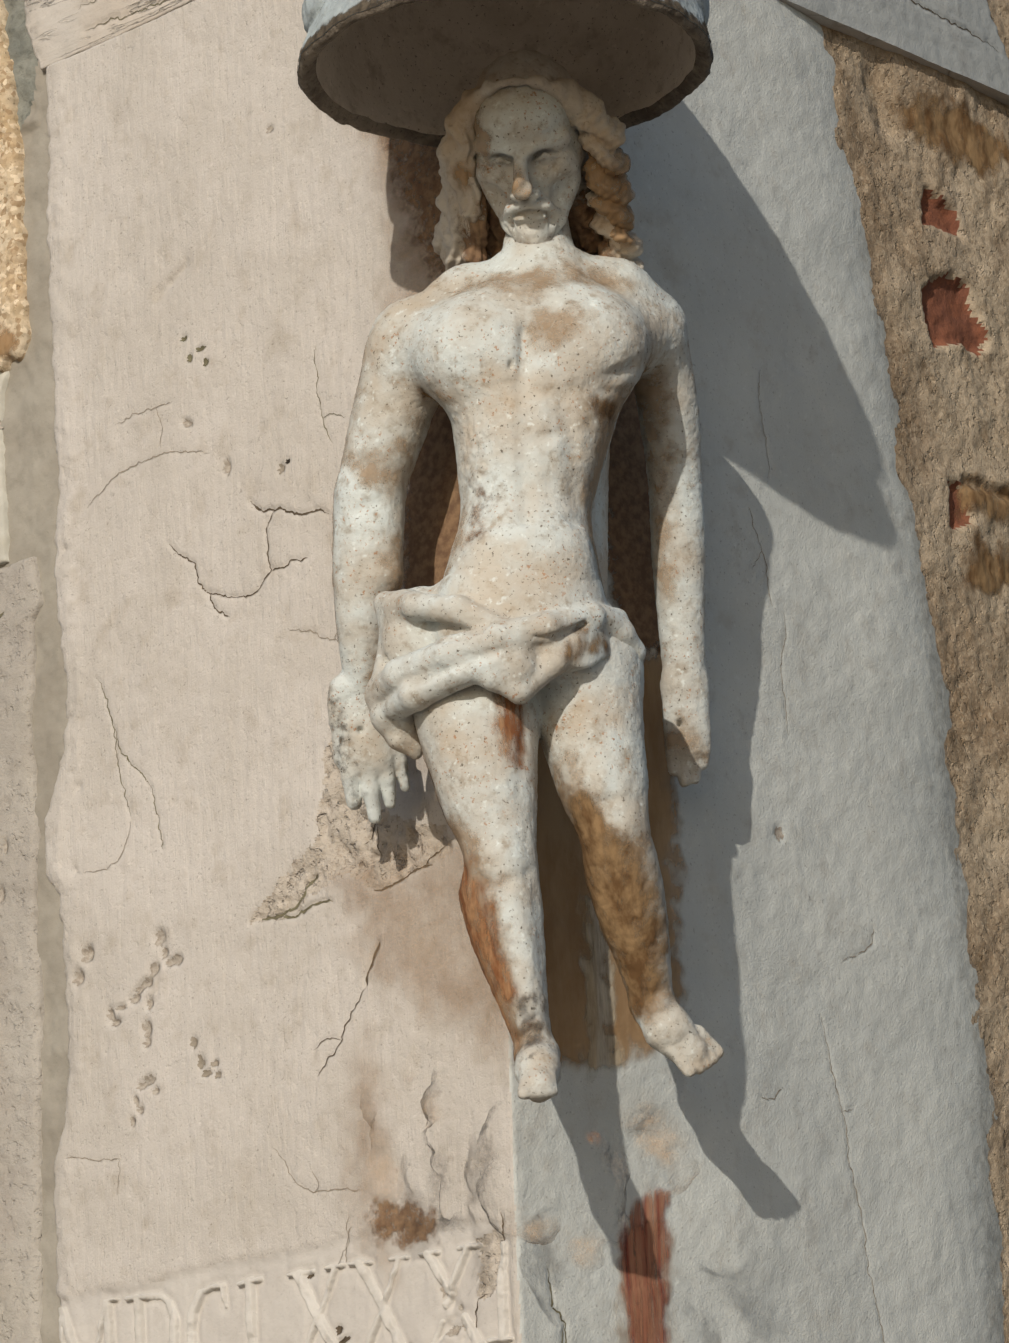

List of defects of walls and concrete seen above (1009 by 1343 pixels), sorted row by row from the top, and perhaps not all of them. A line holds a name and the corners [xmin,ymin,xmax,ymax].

peeling [921,272,988,357]
crack [87,402,202,508]
crack [169,501,329,616]
peeling [947,480,971,530]
crack [83,682,163,873]
spalling [249,740,453,925]
crack [314,942,380,1073]
crack [821,1017,885,1343]
crack [547,1268,567,1343]
corrosion [620,1190,670,1343]